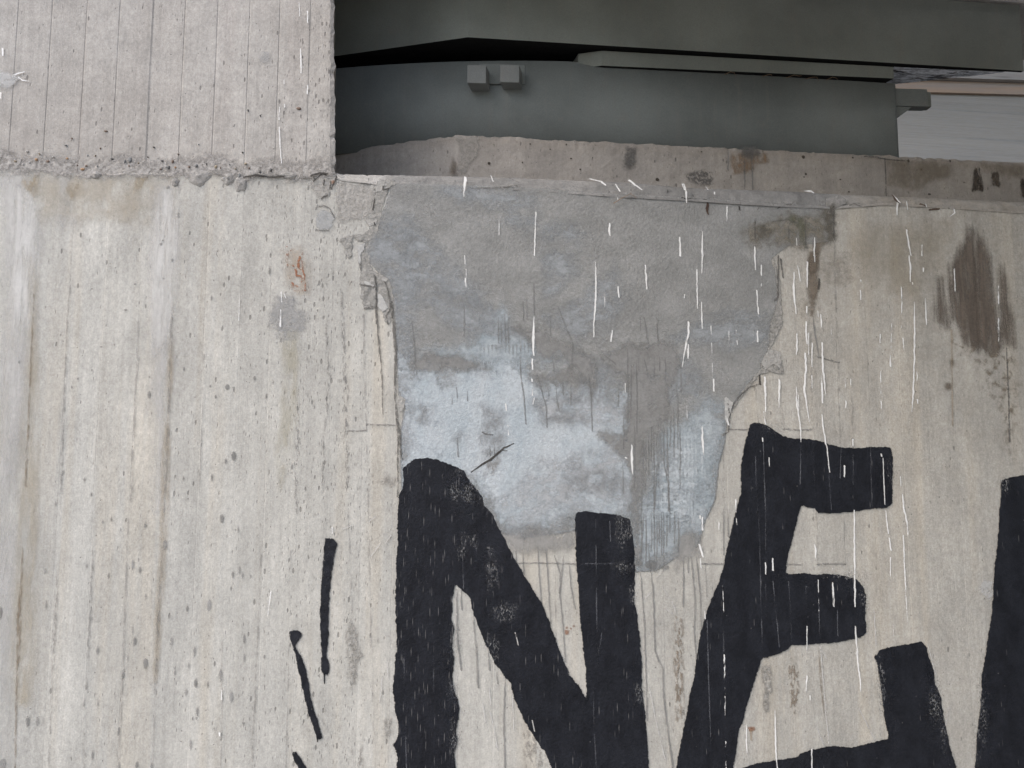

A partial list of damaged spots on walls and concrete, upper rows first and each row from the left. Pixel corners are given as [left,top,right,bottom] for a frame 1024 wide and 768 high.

spalling [339,175,395,325]
spalling [723,255,784,435]
water stain [748,208,835,472]
water stain [880,229,1014,442]
crack [471,432,514,473]